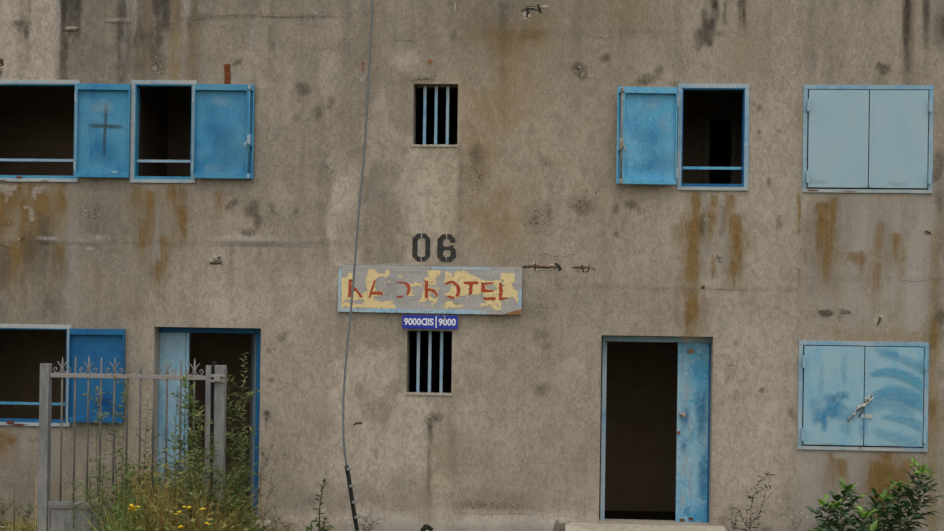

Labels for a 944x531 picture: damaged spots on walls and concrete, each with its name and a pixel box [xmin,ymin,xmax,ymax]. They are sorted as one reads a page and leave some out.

corrosion [687,195,714,281]